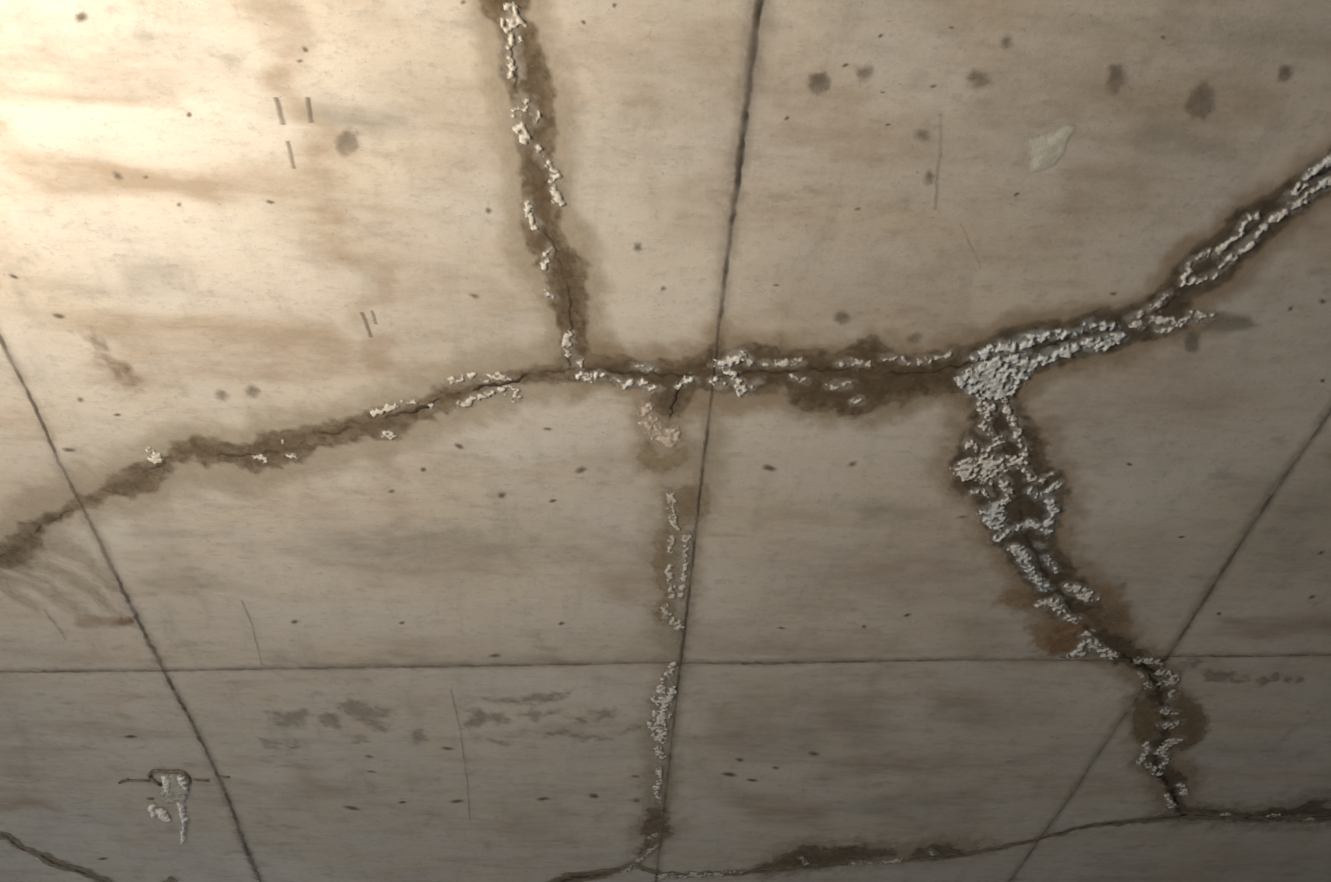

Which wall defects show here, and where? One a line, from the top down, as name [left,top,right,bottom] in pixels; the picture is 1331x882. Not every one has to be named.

water stain [809,74,828,93]
water stain [1108,66,1121,89]
water stain [1186,84,1211,116]
water stain [0,0,611,610]
crack [402,374,526,414]
crack [669,382,679,417]
water stain [566,148,1331,828]
crack [1121,654,1164,696]
water stain [621,662,678,873]
crack [549,744,1331,882]
crack [0,832,111,882]